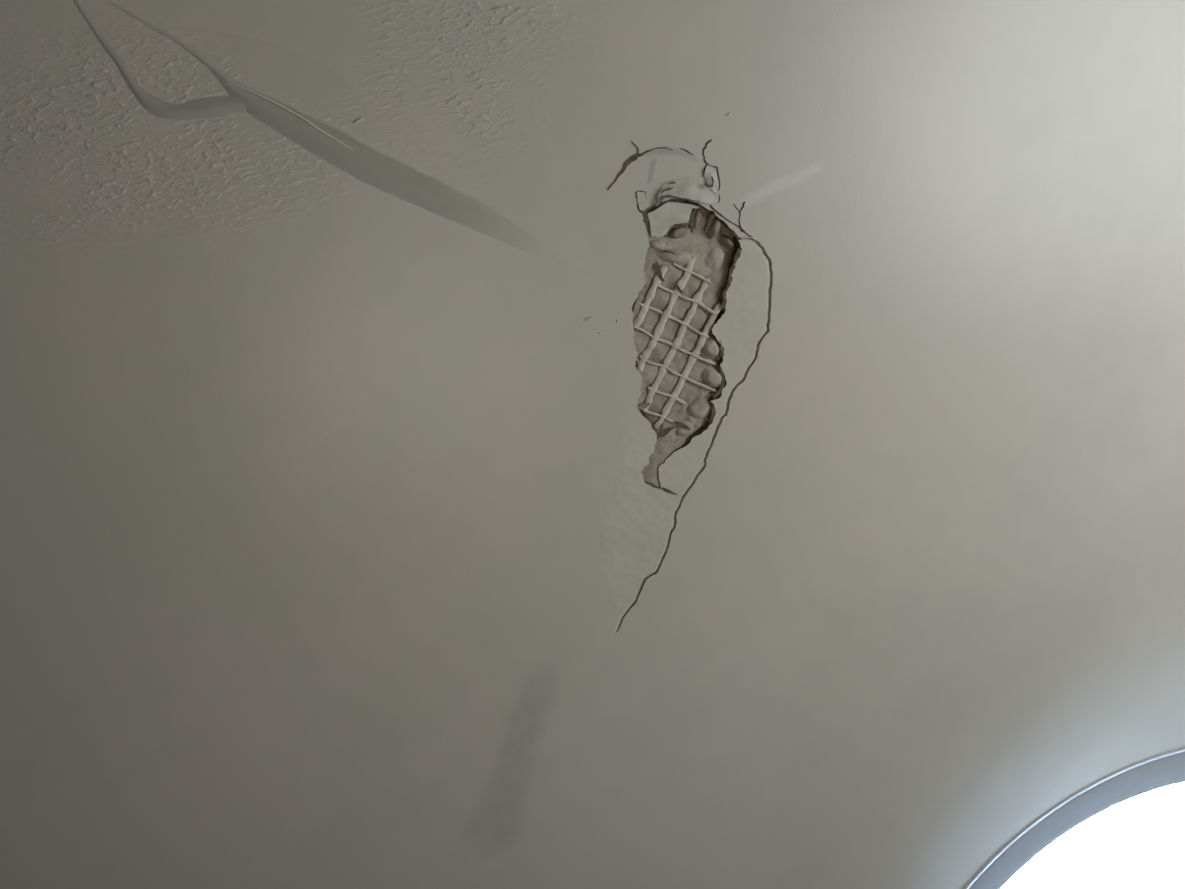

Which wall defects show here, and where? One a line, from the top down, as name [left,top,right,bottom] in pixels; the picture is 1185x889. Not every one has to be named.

flaking render [598,165,774,633]